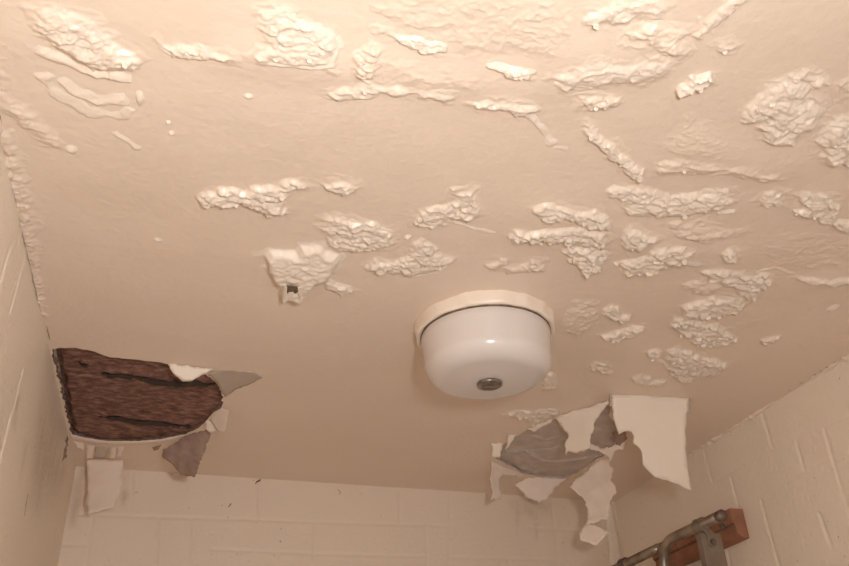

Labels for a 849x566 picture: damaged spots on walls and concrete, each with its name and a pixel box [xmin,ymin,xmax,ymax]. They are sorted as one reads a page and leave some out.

peeling [250,241,352,305]
flaking render [490,394,692,546]